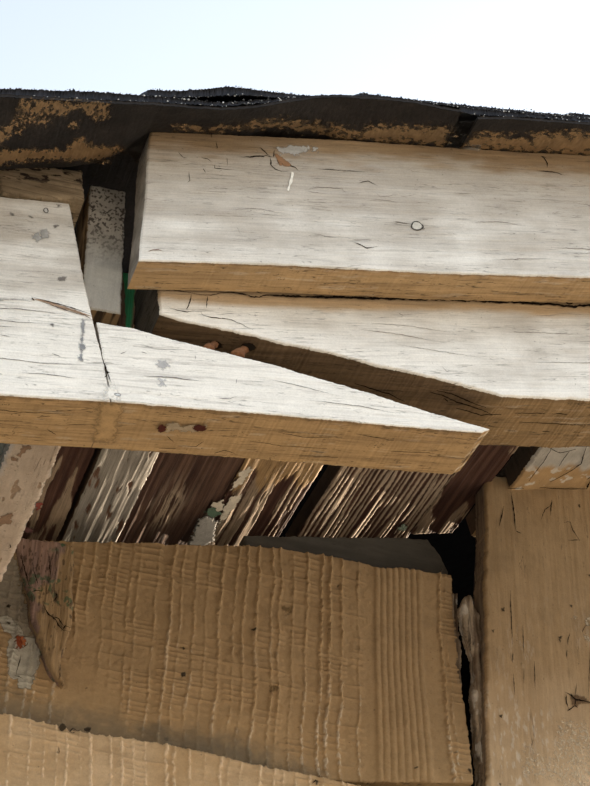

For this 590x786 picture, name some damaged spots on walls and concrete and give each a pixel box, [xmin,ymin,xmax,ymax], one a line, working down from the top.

peeling [0,513,13,526]
peeling [0,527,74,689]